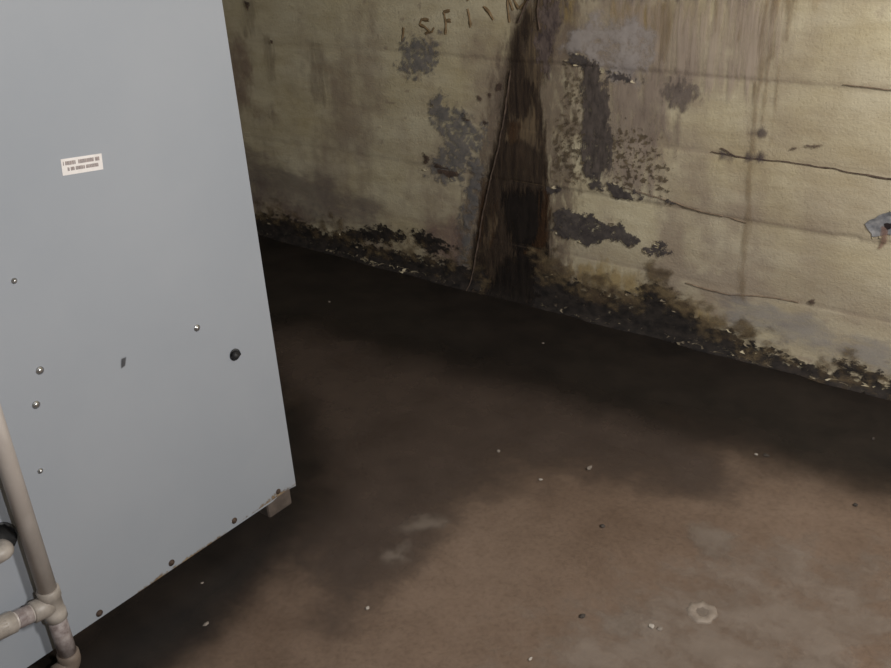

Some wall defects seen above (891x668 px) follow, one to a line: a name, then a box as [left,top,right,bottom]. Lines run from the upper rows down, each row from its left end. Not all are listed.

damp [258,0,891,493]
spalling [527,208,891,401]
crack [711,148,891,180]
damp [73,321,721,668]